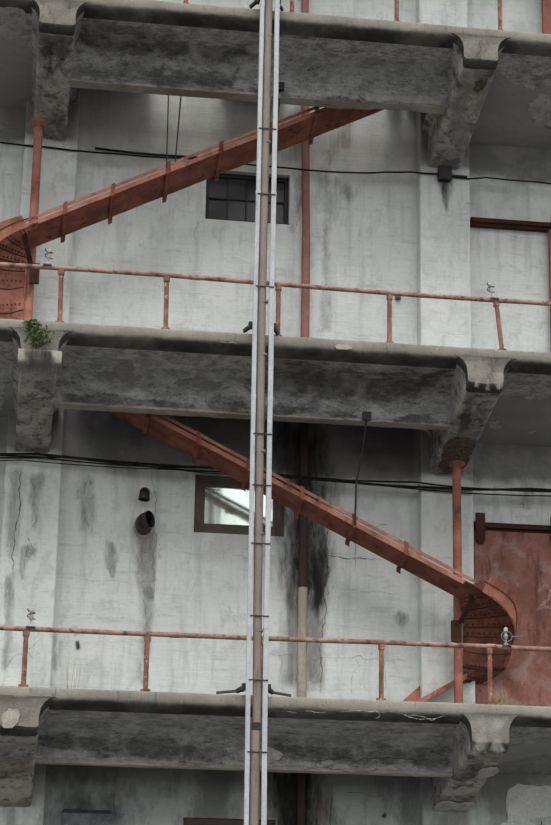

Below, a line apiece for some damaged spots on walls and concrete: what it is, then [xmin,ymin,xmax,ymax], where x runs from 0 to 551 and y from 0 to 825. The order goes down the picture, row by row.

peeling [0,7,27,42]
spalling [434,438,476,477]
crack [11,474,37,570]
water stain [280,773,307,825]